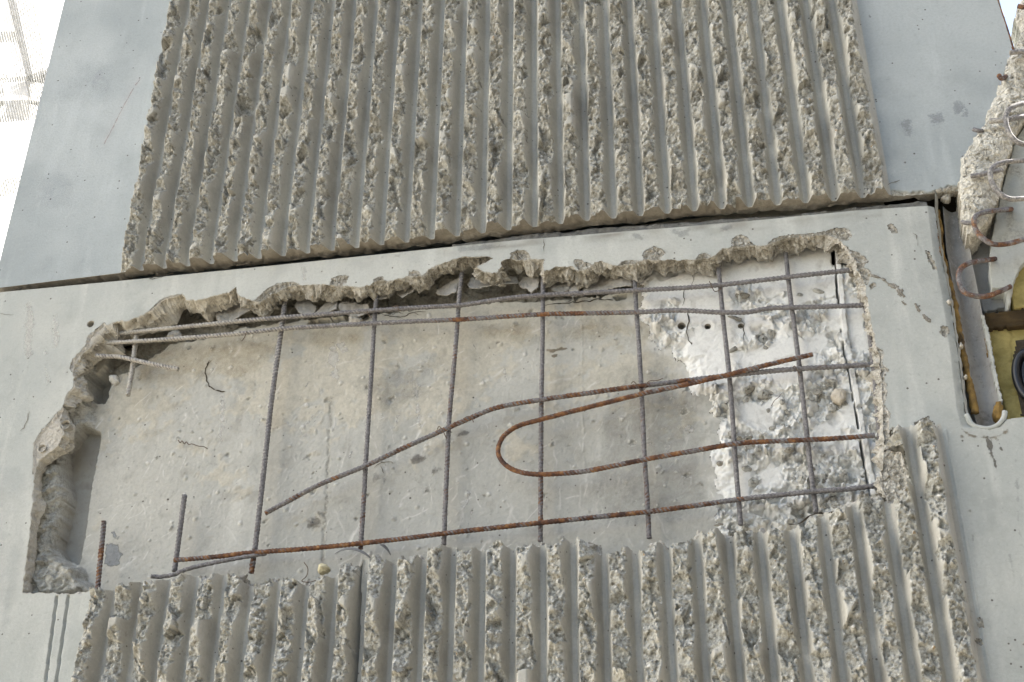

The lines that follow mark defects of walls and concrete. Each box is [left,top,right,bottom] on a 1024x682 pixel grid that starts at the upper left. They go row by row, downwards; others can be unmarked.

spalling [884,0,1024,311]
spalling [22,228,907,595]